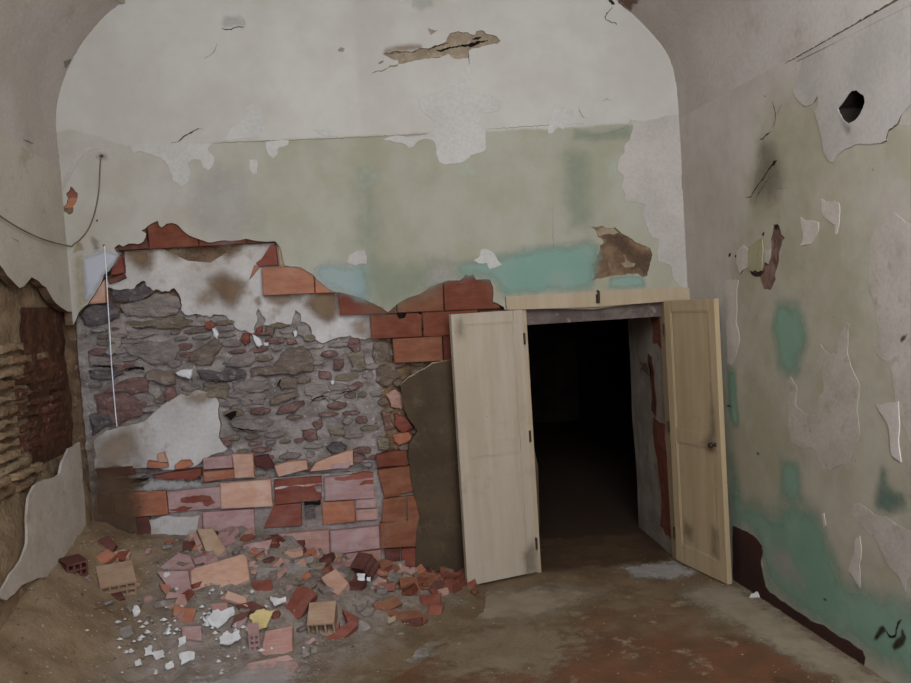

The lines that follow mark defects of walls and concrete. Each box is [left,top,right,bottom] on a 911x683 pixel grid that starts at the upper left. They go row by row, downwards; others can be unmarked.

peeling [378,31,502,165]
spalling [618,0,638,10]
crack [786,0,911,63]
peeling [793,5,911,162]
spalling [64,187,78,215]
peeling [592,115,688,288]
spalling [724,224,785,365]
peeling [869,212,911,462]
flaking render [0,279,94,631]
flaking render [80,222,507,677]
peeling [848,503,911,590]
leakage [874,619,906,649]